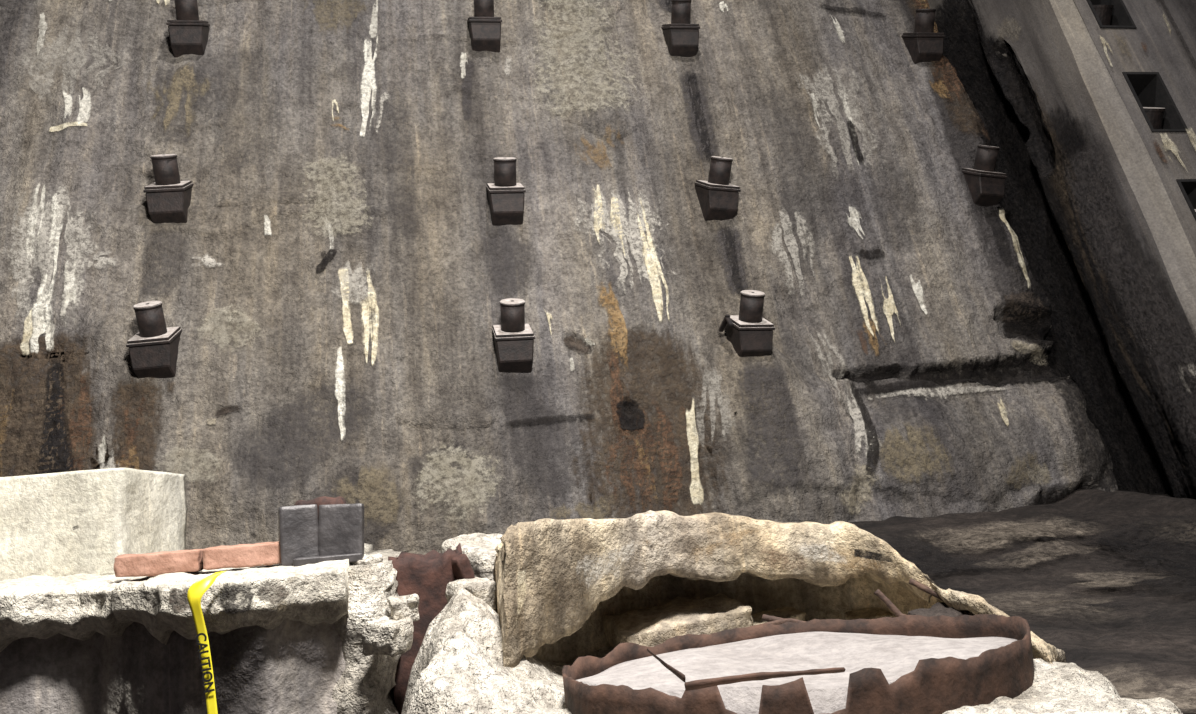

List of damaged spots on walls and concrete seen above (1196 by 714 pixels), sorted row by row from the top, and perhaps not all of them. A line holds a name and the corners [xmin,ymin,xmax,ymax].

efflorescence [360,0,388,136]
damp [800,69,876,165]
efflorescence [8,184,116,354]
efflorescence [575,185,675,321]
damp [848,207,864,239]
damp [849,256,900,341]
damp [899,0,1196,498]
damp [239,262,379,484]
rust [556,285,728,519]
damp [869,384,1009,426]
crack [837,352,1072,477]
rust [340,468,398,522]